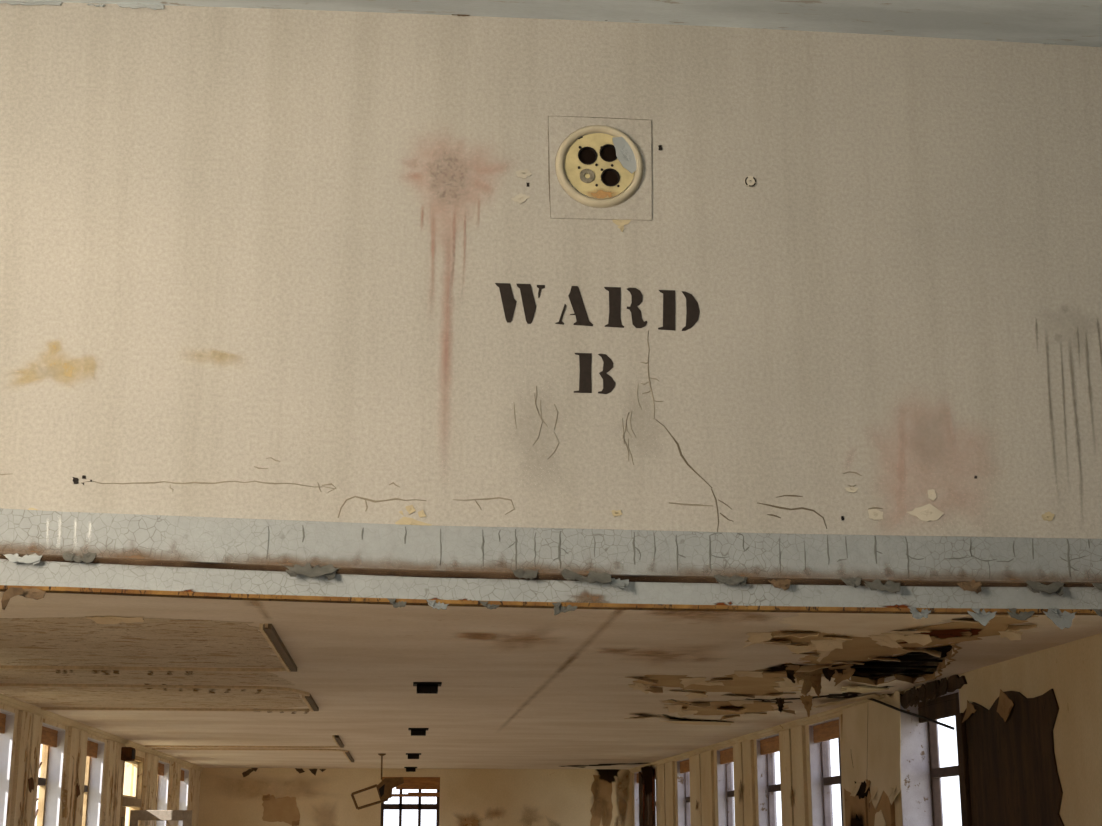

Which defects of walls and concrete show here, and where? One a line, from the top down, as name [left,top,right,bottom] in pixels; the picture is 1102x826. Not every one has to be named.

water stain [1047,350,1080,459]
crack [632,331,749,571]
crack [453,497,568,569]
crack [758,495,848,574]
peeling [840,576,901,593]
crack [874,536,1090,579]
peeling [625,579,1076,723]
spalling [262,794,300,826]